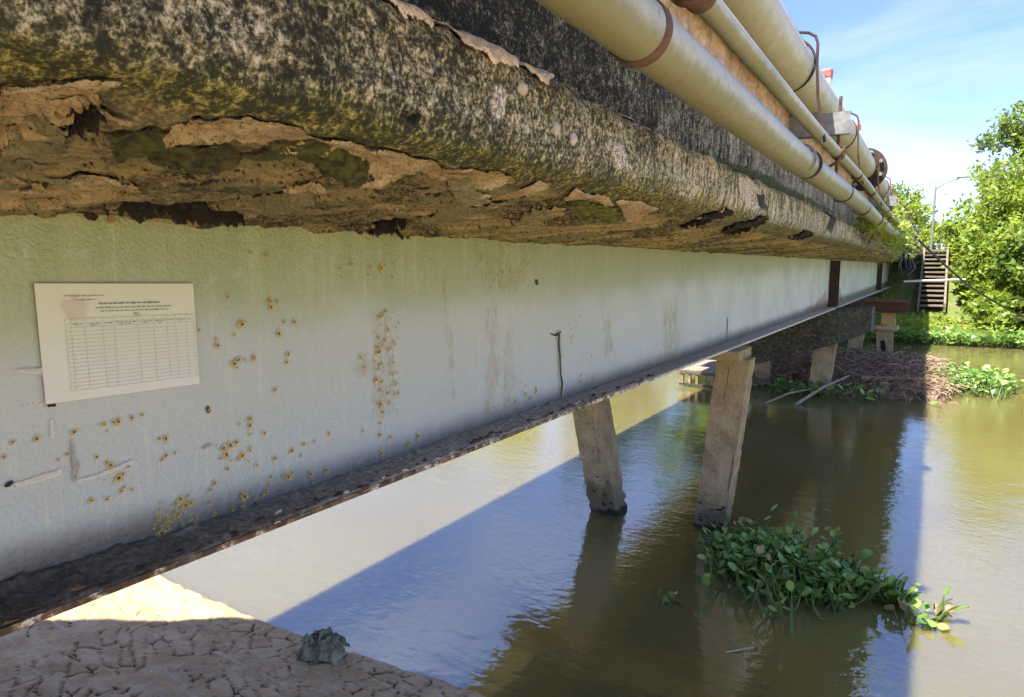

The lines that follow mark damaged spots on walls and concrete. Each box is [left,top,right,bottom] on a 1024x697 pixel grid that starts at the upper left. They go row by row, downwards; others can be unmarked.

water stain [491,86,506,119]
spalling [0,78,326,228]
spalling [163,115,549,207]
water stain [610,142,628,170]
spalling [519,188,659,225]
spalling [679,207,770,237]
water stain [738,177,768,210]
water stain [825,211,837,234]
corrosion [359,310,400,439]
corrosion [216,417,266,471]
corrosion [89,455,134,503]
corrosion [136,471,389,573]